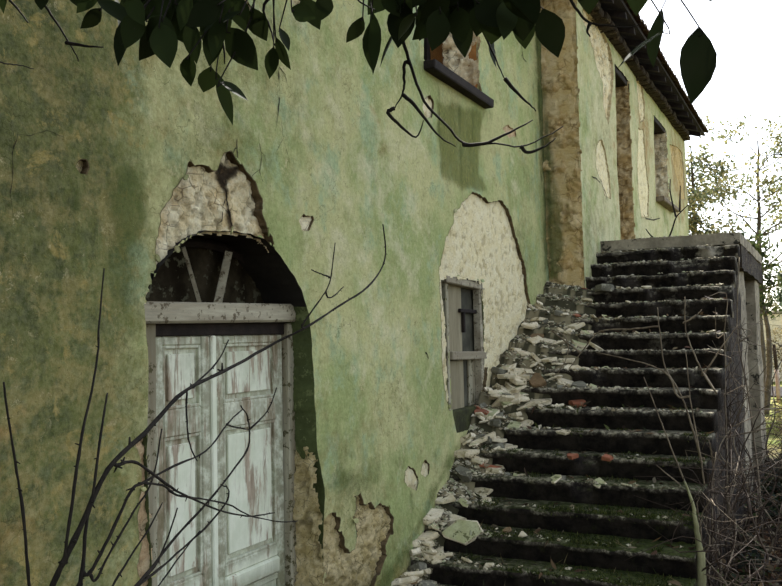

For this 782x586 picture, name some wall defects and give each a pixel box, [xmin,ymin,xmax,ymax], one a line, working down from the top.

peeling [423,95,434,118]
spalling [442,32,482,91]
spalling [541,0,685,288]
peeling [151,151,275,272]
spalling [299,214,314,231]
peeling [439,192,530,411]
peeling [293,446,394,586]
peeling [405,460,430,490]